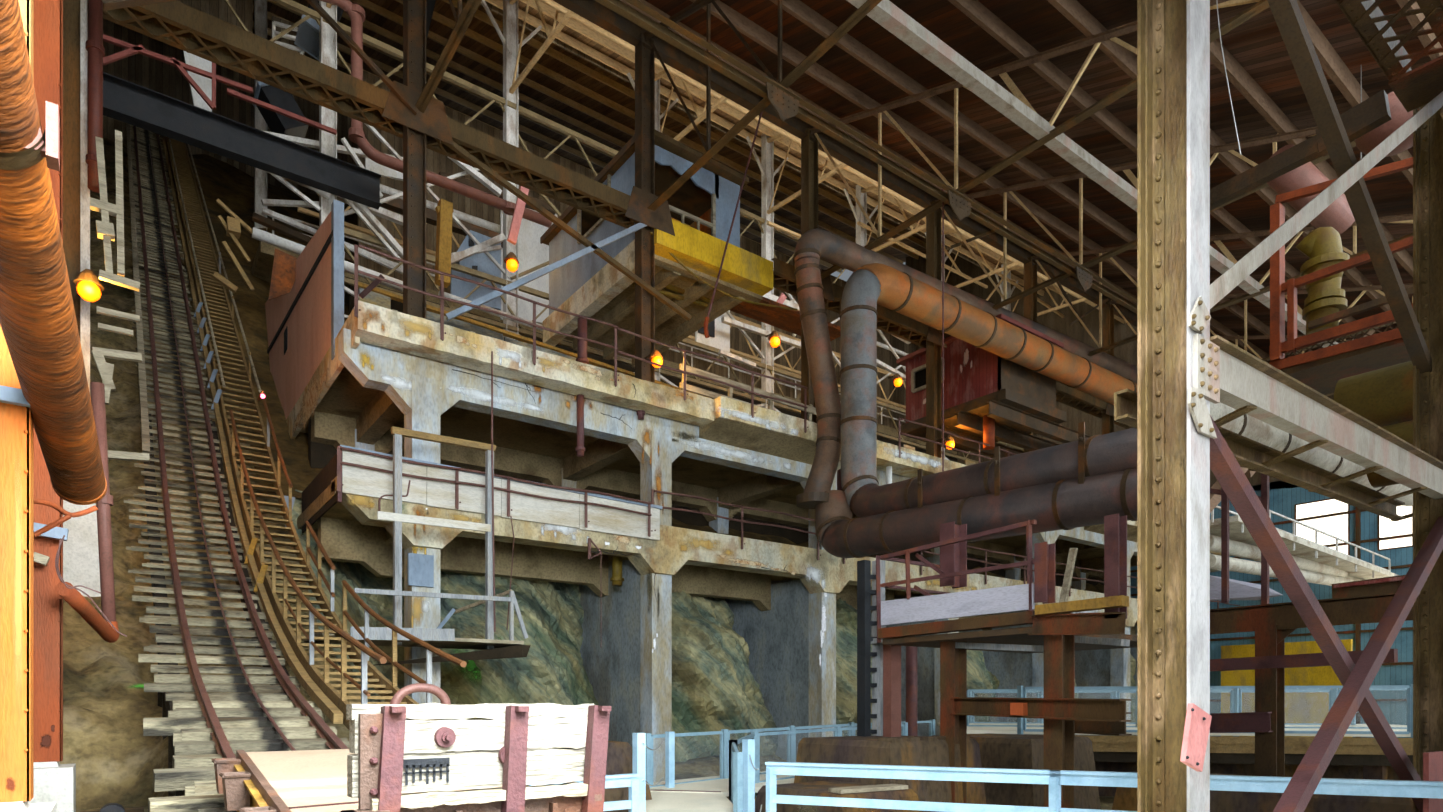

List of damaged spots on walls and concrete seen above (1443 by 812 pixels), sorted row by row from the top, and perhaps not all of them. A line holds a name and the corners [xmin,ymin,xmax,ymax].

efflorescence [451,387,540,410]
water stain [722,411,797,434]